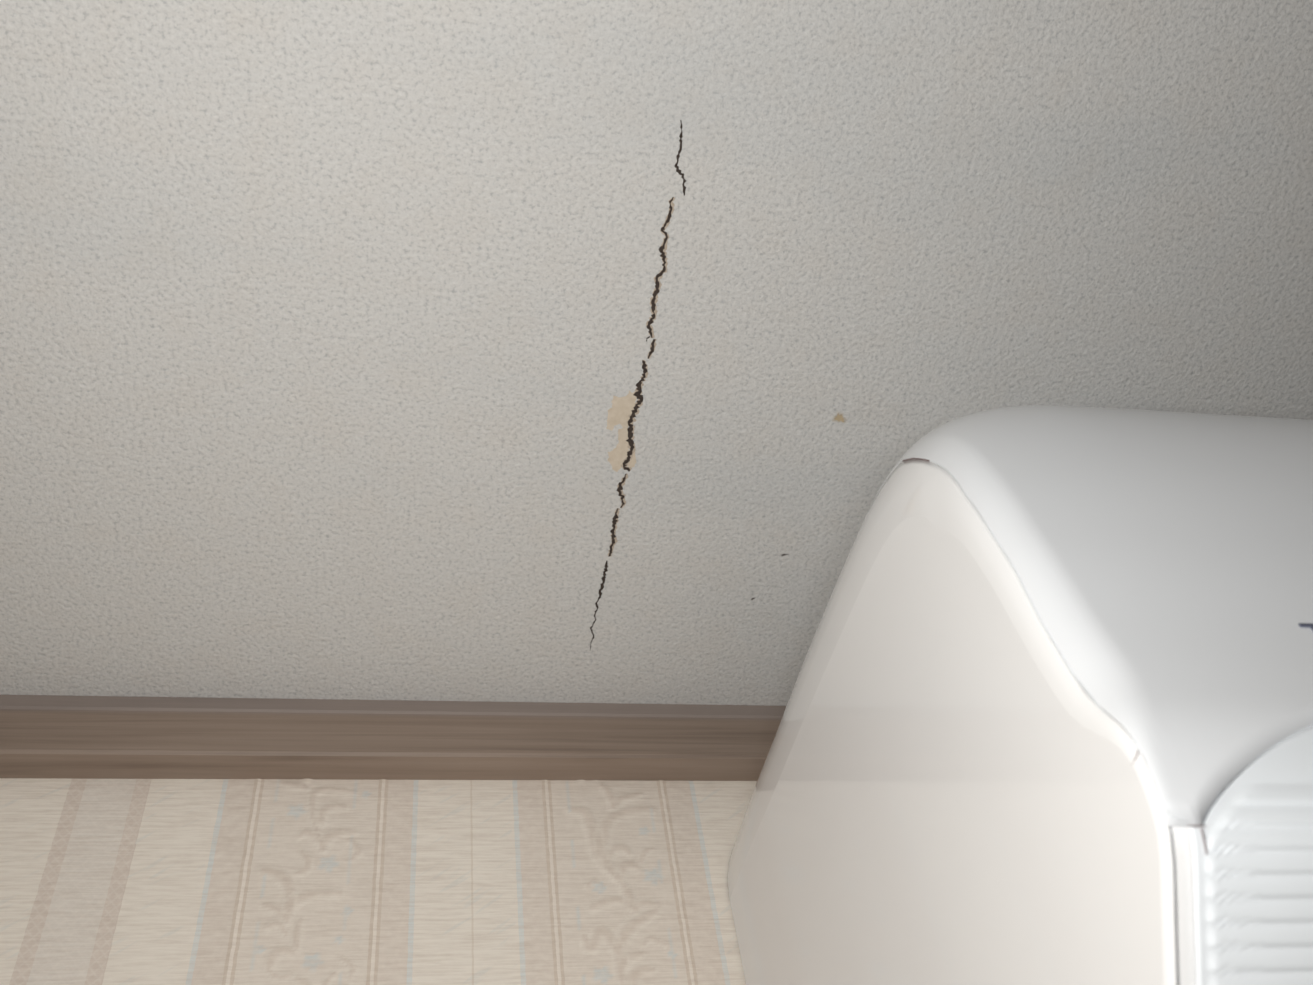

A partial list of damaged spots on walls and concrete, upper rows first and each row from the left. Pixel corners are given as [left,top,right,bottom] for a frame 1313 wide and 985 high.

peeling [607,391,636,472]
crack [590,120,686,649]